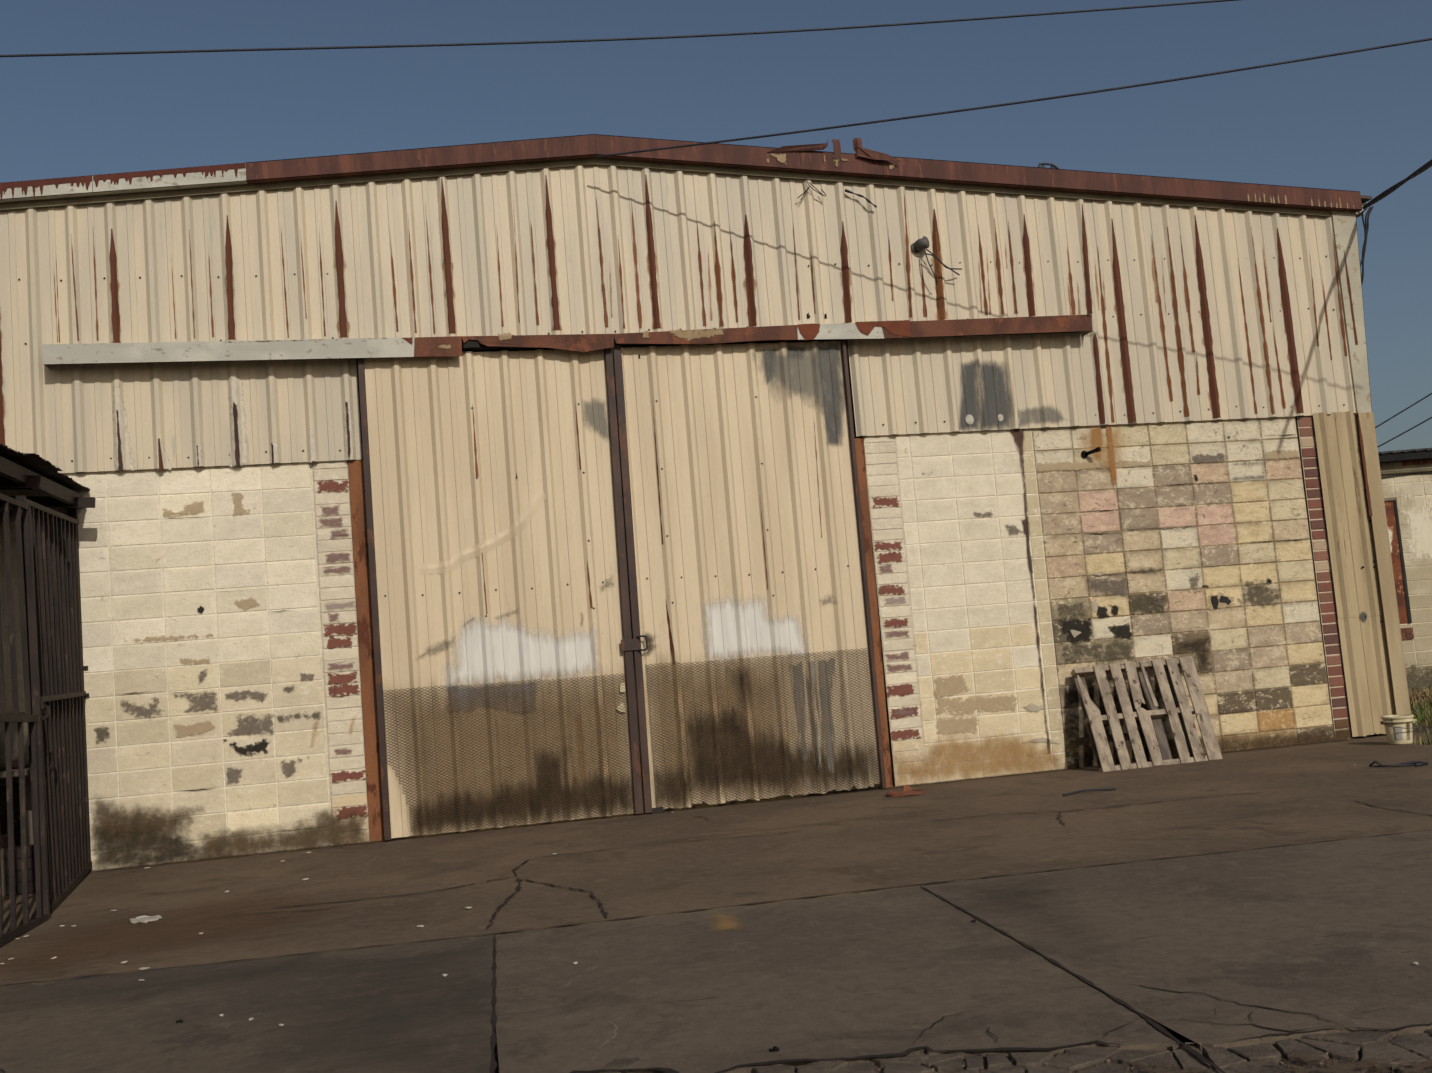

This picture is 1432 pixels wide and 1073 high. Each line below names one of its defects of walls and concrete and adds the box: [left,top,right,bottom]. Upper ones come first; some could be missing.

rust [0,163,245,199]
rust [301,201,349,340]
peeling [124,634,213,642]
peeling [323,601,361,697]
leakage [94,428,1349,871]
peeling [174,721,215,737]
peeling [329,770,366,784]
peeling [336,804,368,819]